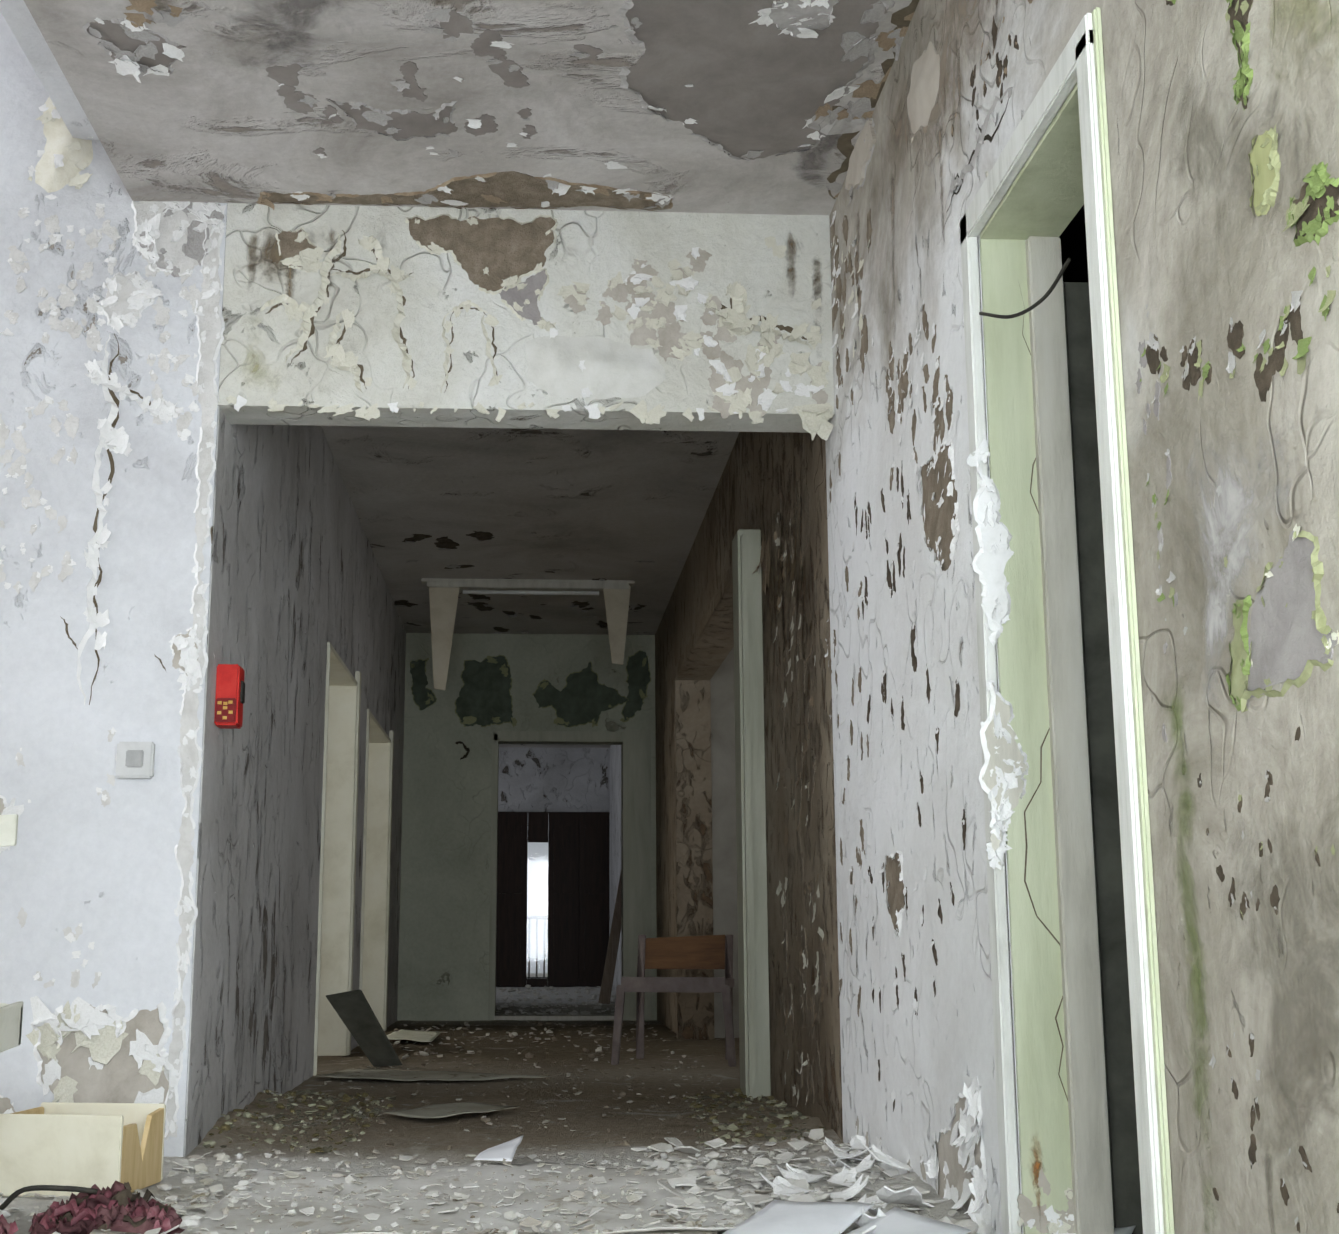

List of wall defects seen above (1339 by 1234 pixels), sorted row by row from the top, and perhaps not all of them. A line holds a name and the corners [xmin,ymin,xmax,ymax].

peeling [83,17,186,83]
peeling [266,61,498,157]
peeling [609,0,895,161]
peeling [970,6,1019,121]
crack [260,230,503,393]
peeling [257,118,1014,646]
peeling [7,201,247,1140]
damp [766,501,803,651]
peeling [1203,471,1339,713]
peeling [753,483,905,1111]
peeling [979,680,1029,870]
peeling [840,819,955,1017]